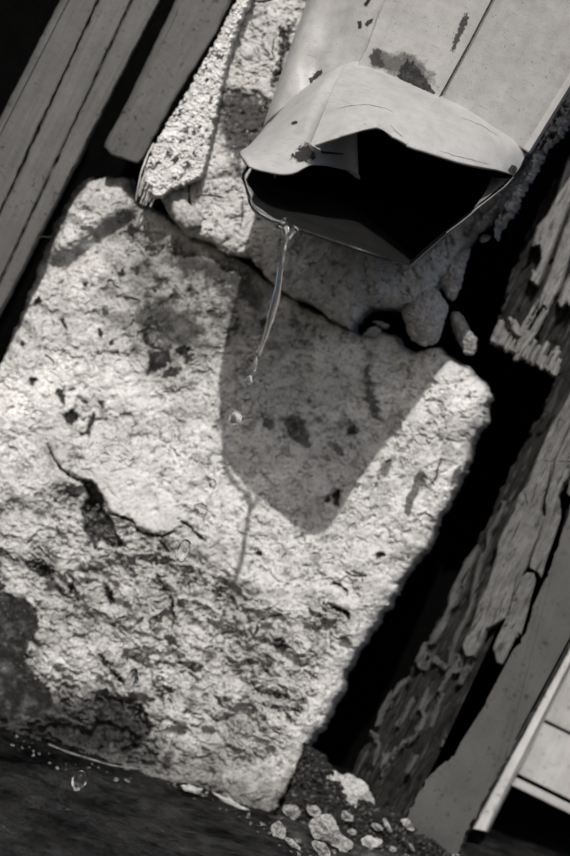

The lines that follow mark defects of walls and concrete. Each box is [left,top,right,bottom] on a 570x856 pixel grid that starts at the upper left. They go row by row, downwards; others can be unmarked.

crack [48,445,79,480]
crack [109,513,205,541]